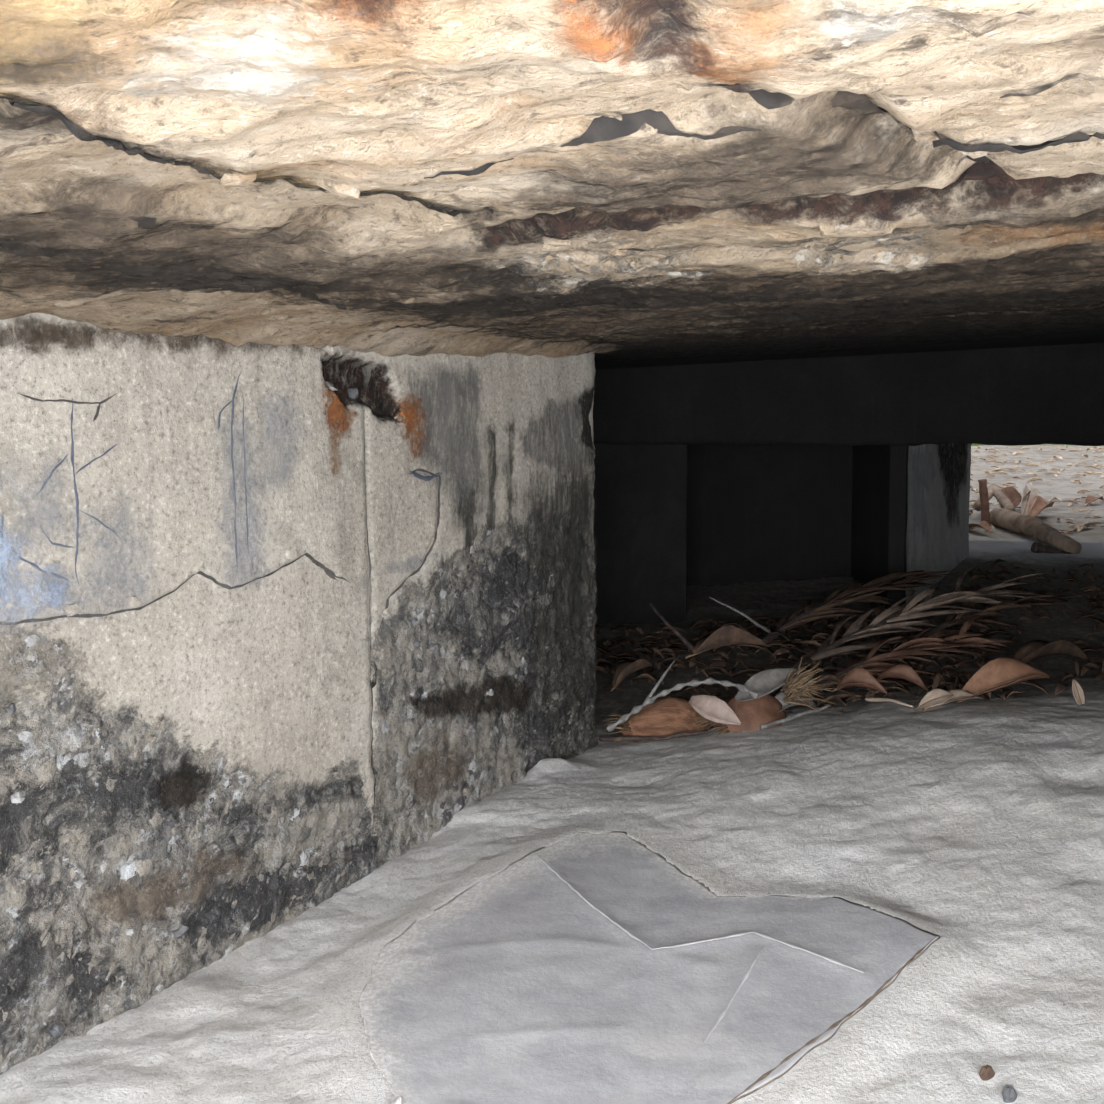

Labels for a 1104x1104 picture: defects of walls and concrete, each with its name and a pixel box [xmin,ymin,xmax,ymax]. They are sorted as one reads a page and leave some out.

leakage [0,112,68,134]
crack [0,93,514,230]
crack [561,89,793,147]
leakage [517,94,934,215]
crack [832,91,1104,164]
crack [1000,73,1104,98]
leakage [0,179,1104,362]
spalling [321,346,401,422]
rust [323,389,356,475]
rust [397,395,426,458]
leakage [938,443,968,526]
leakage [409,368,598,759]